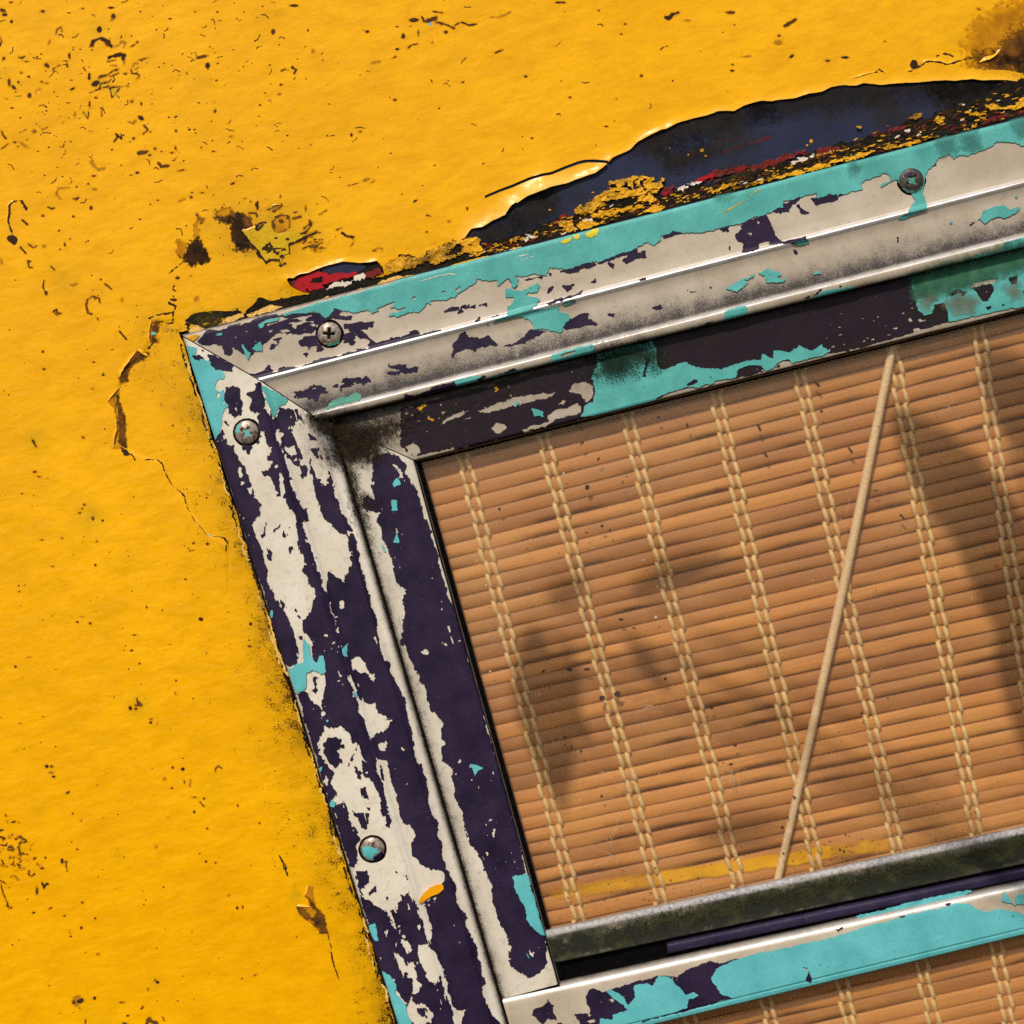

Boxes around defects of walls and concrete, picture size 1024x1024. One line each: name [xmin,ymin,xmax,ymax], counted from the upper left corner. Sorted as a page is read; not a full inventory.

peeling [239,195,354,266]
peeling [969,195,1020,226]
crack [125,451,229,551]
peeling [296,885,339,979]
peeling [532,1000,562,1024]